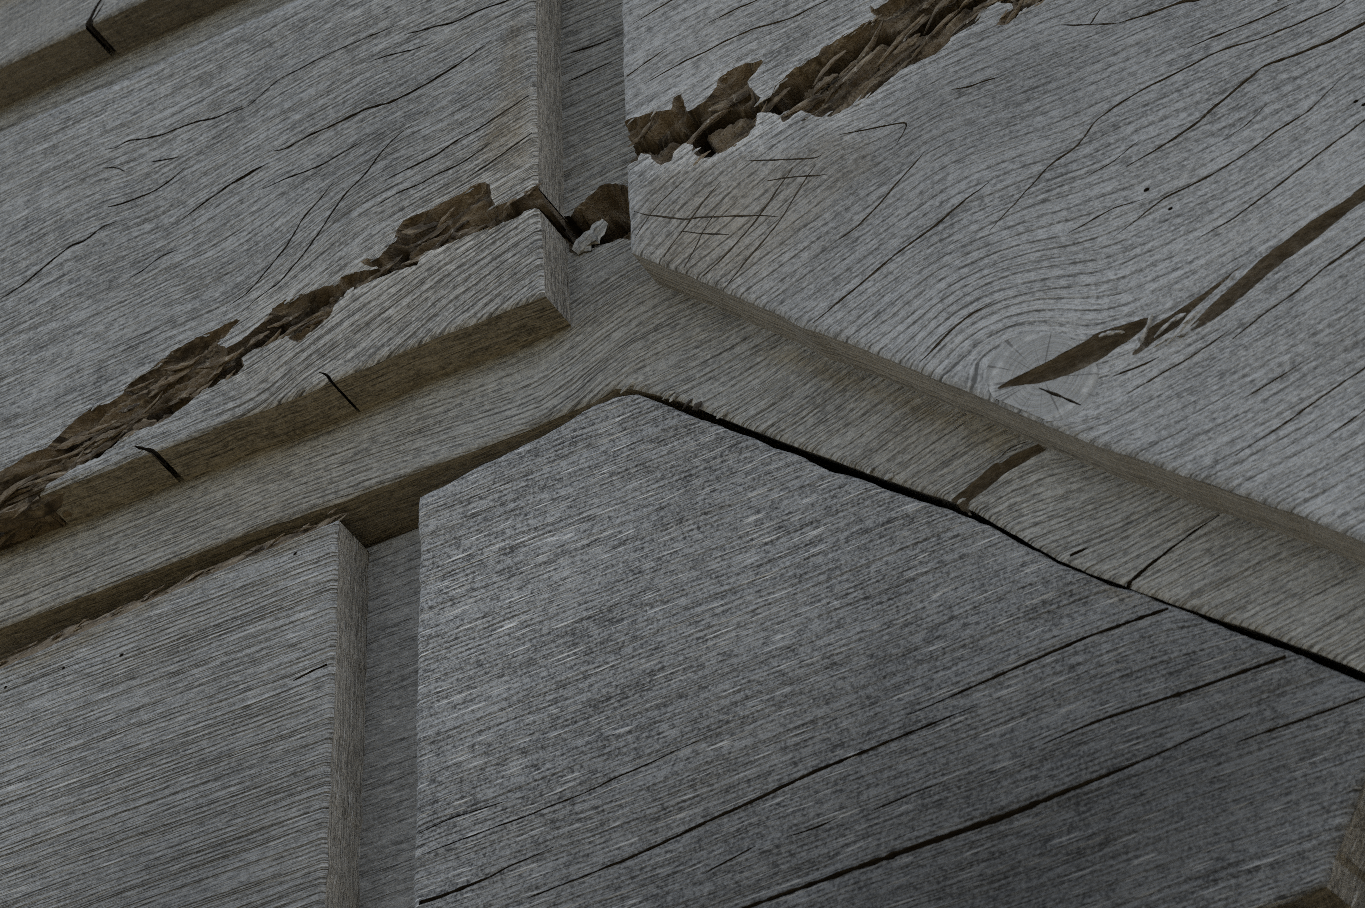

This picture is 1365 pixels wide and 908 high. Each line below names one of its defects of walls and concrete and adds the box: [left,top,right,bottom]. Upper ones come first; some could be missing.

peeling [672,0,1044,166]
crack [991,0,1365,237]
peeling [333,183,542,297]
peeling [572,219,609,255]
crack [813,182,989,323]
crack [998,184,1365,406]
peeling [0,288,328,525]
crack [951,441,1046,515]
crack [529,515,1219,898]
crack [1043,655,1286,745]
crack [420,735,710,855]
crack [742,696,1365,908]